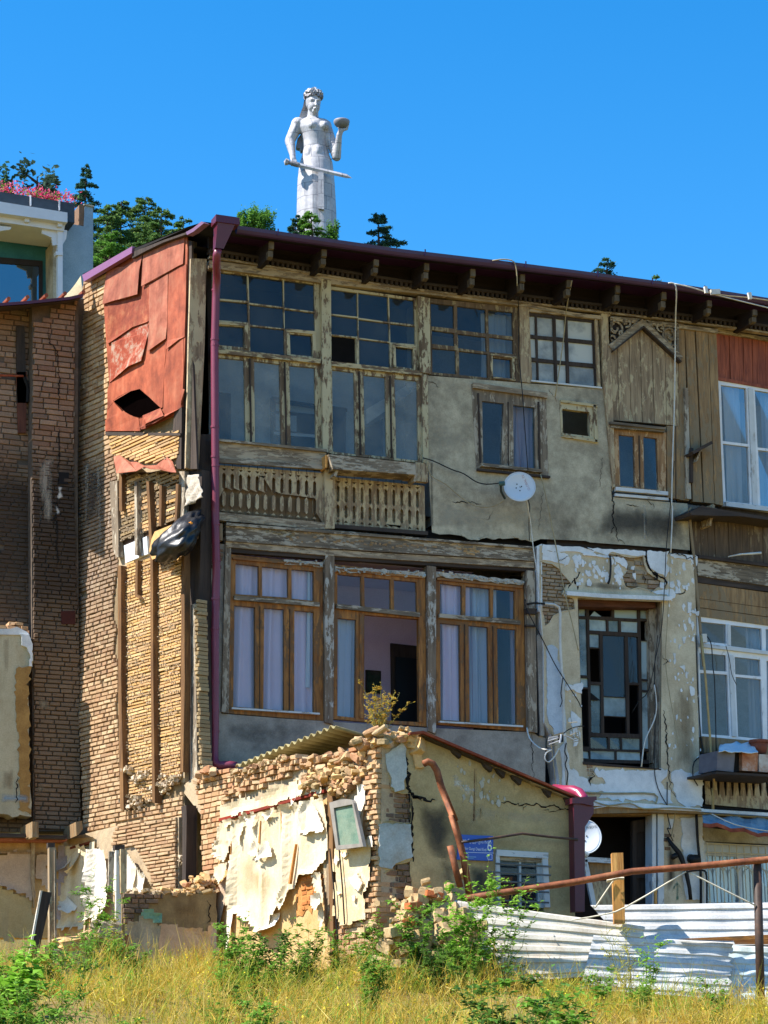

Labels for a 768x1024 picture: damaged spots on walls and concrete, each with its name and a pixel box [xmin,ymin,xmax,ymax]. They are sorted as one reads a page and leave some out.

spalling [450,532,500,555]
crack [559,457,685,595]
peeling [20,634,33,667]
peeling [513,535,704,900]
spalling [192,724,420,917]
crack [405,757,435,862]
crack [501,801,567,812]
flaking render [113,843,348,976]